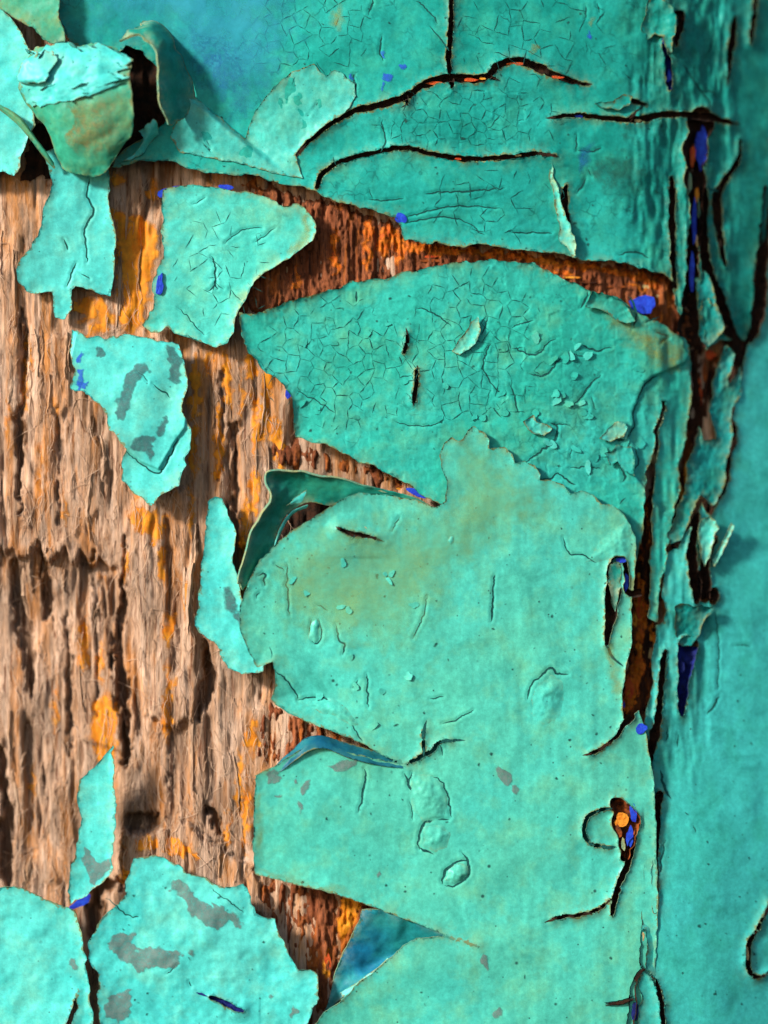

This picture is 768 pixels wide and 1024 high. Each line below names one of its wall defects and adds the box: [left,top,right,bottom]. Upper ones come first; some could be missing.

crack [214,0,768,353]
peeling [69,165,742,567]
crack [173,197,656,505]
peeling [0,746,443,1024]
peeling [194,436,433,674]
peeling [257,694,409,776]
crack [358,769,366,811]
crack [489,575,497,621]
crack [527,667,566,698]
peeling [604,477,664,734]
crack [544,514,747,923]